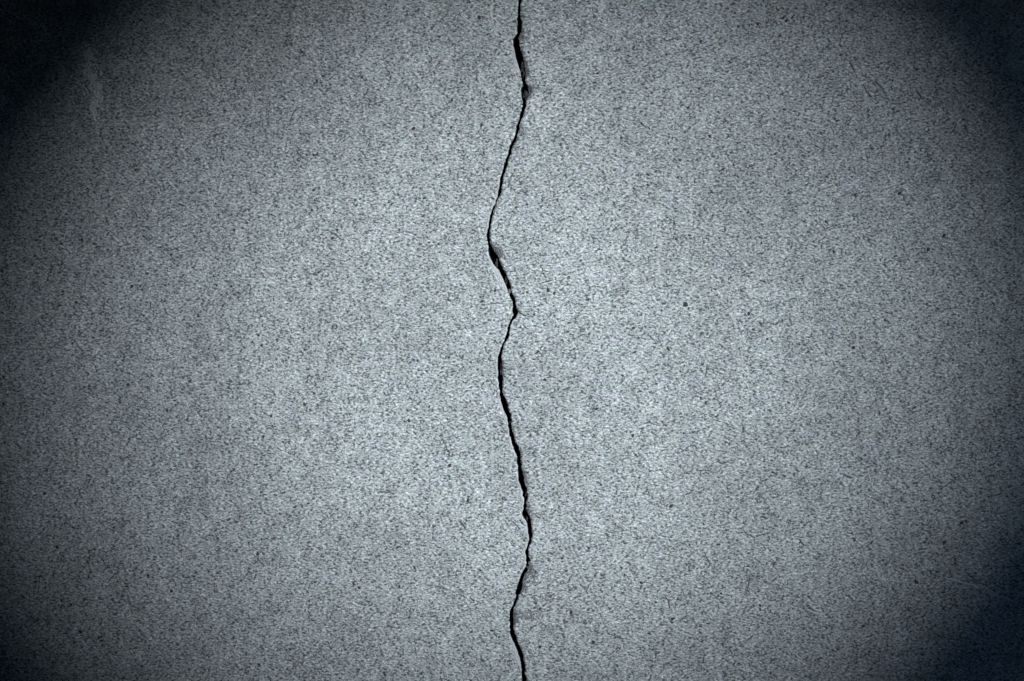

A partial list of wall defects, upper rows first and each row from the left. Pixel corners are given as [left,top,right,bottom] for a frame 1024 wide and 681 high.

crack [484,0,561,681]